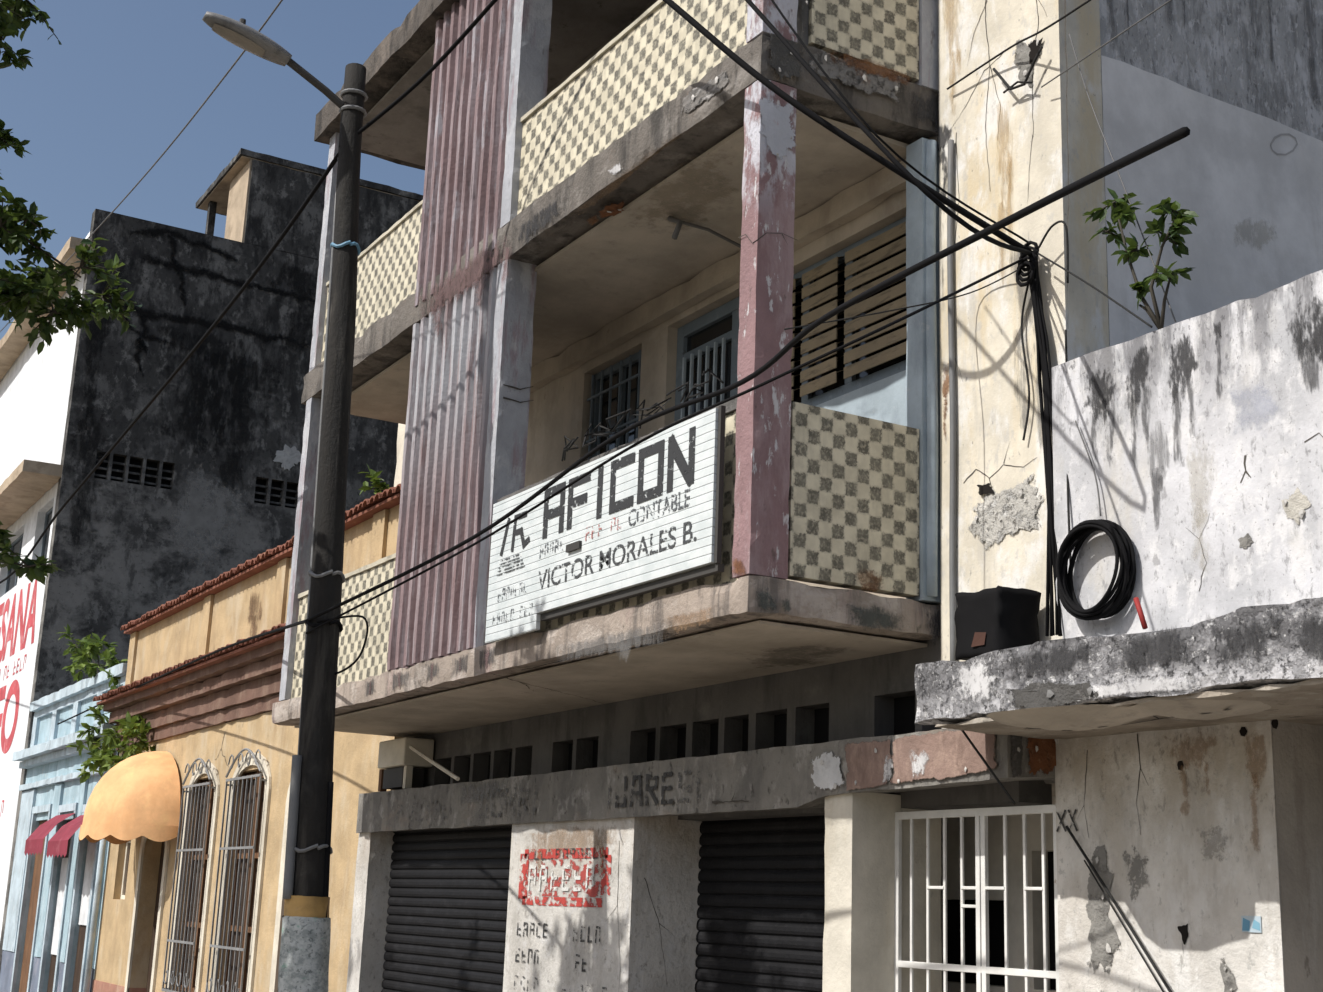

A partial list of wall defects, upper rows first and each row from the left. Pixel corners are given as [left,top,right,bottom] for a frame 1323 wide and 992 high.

spalling [759,98,797,160]
damp [271,263,318,352]
damp [1213,323,1222,394]
damp [1291,298,1323,389]
damp [1084,347,1150,466]
damp [1169,334,1198,461]
spalling [969,473,1043,550]
damp [927,607,941,643]
damp [1078,628,1200,701]
spalling [811,730,1058,791]
spalling [1086,845,1149,974]
spalling [1220,957,1237,992]